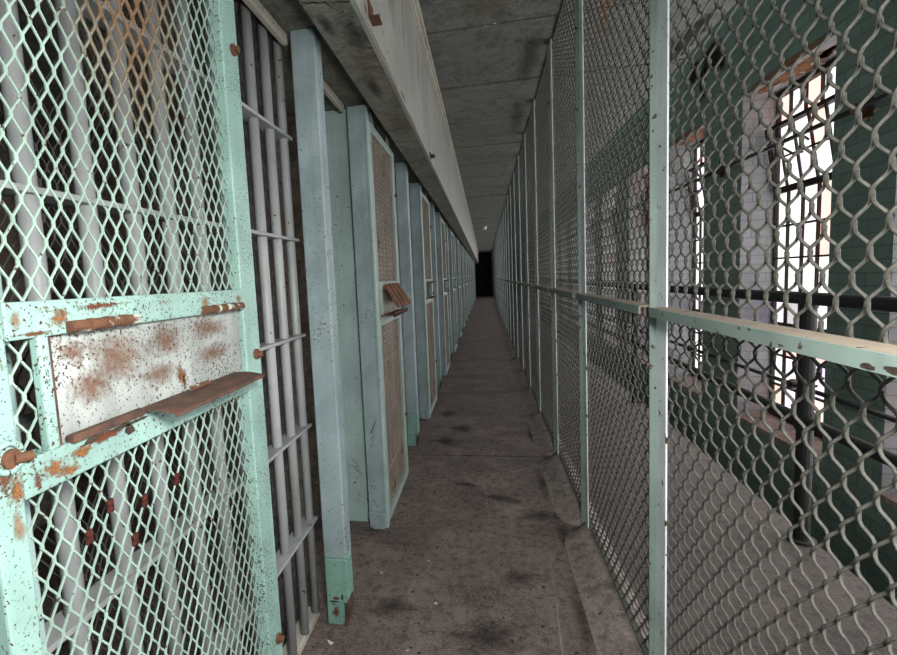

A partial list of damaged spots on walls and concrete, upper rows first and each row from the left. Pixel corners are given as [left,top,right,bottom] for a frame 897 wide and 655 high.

rust [84,302,118,310]
rust [11,307,67,337]
rust [96,341,134,375]
rust [81,376,101,398]
rust [148,365,186,388]
rust [0,476,24,503]
rust [15,516,24,536]